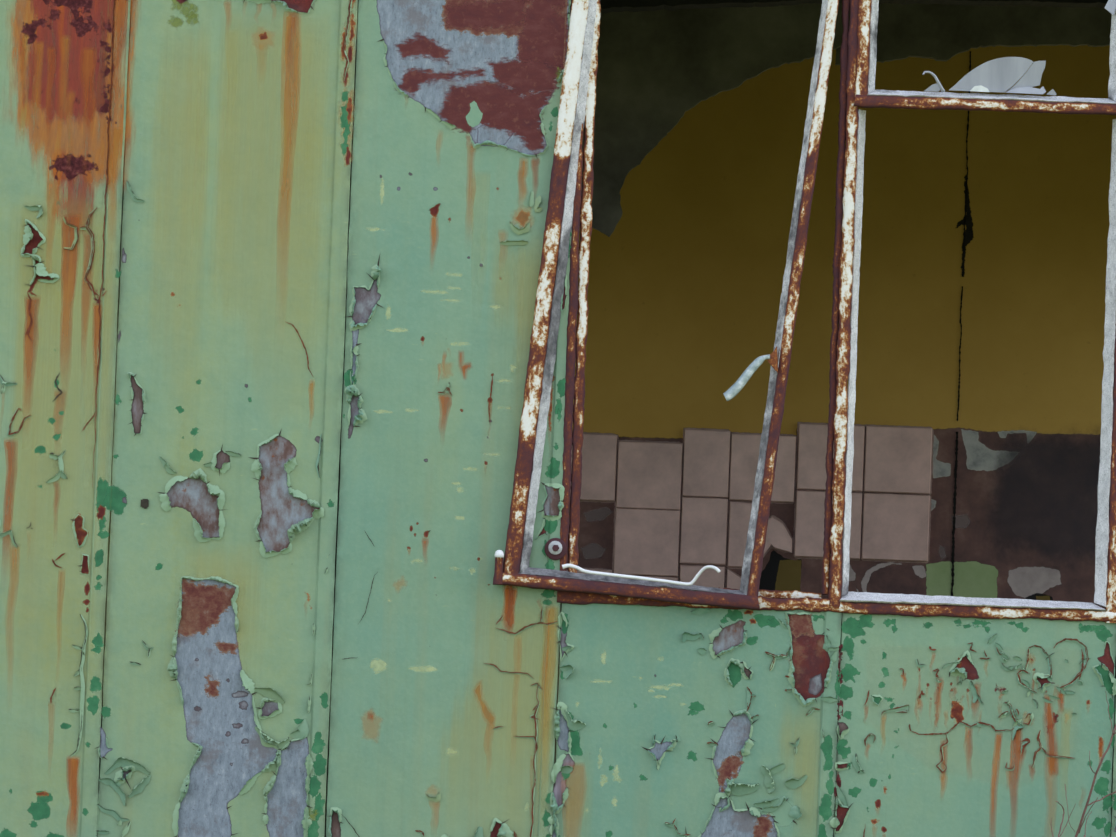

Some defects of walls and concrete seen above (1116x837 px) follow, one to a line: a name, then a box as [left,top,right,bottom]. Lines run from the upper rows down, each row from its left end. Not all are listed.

peeling [376,0,572,204]
rust [11,0,137,466]
peeling [343,256,383,439]
rust [505,267,539,328]
peeling [158,444,230,542]
peeling [248,429,334,558]
peeling [534,443,615,570]
peeling [848,427,1108,609]
peeling [167,576,342,837]
peeling [709,609,898,837]
rust [926,657,983,727]
rust [987,634,1083,785]